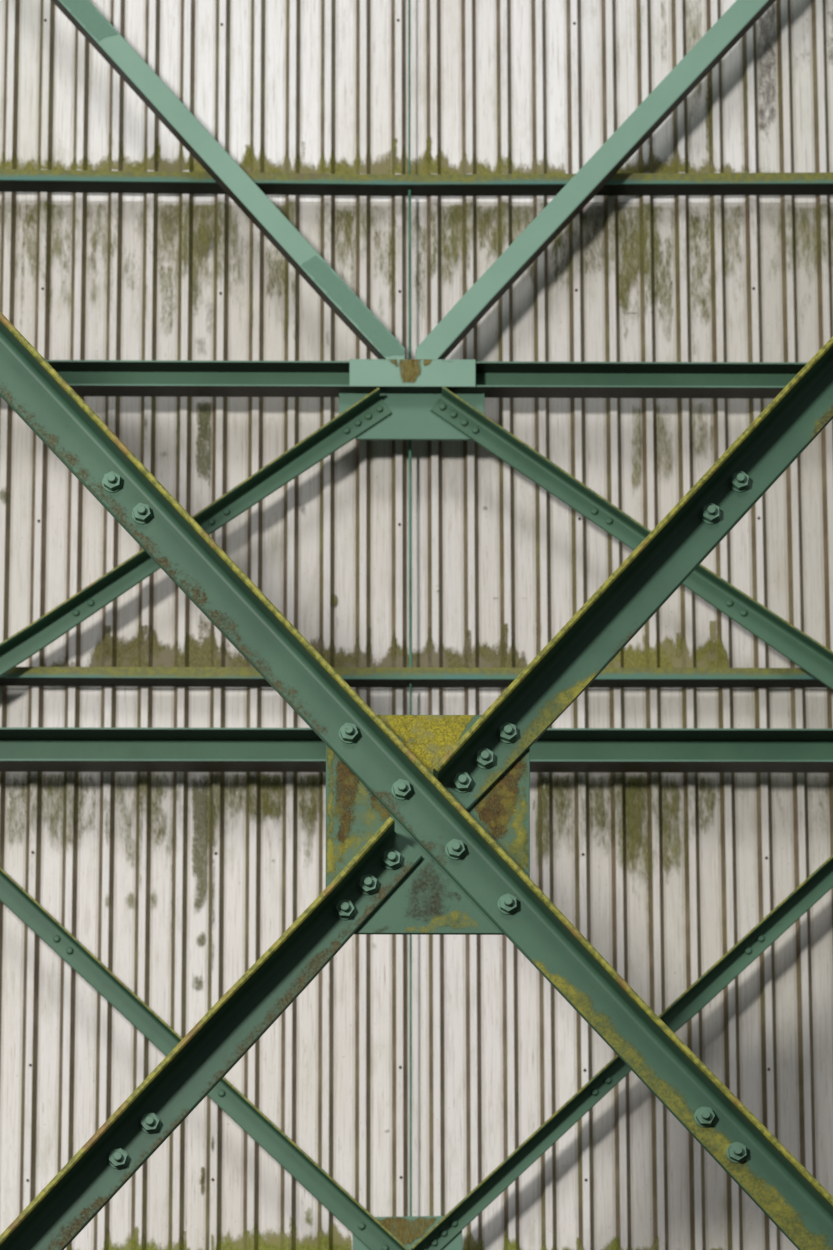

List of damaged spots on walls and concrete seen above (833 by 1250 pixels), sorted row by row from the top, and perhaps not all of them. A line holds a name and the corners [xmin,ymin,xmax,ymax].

rust [391,359,432,382]
rust [336,762,389,850]
rust [476,757,526,839]